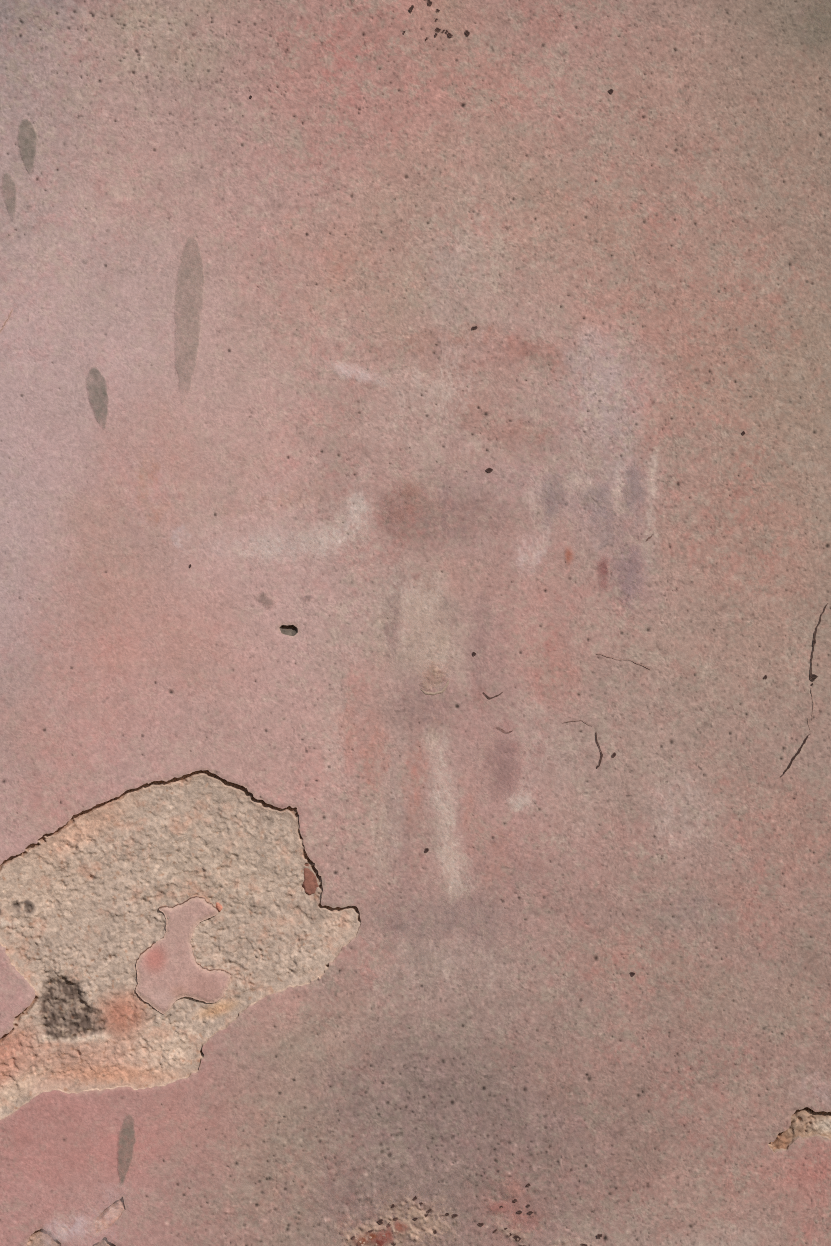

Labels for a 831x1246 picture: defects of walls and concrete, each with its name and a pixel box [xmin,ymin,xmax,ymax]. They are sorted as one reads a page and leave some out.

crack [781,603,828,777]
flaking render [0,770,361,1120]
flaking render [768,1107,831,1153]
flaking render [27,1229,61,1246]
flaking render [93,1197,126,1246]